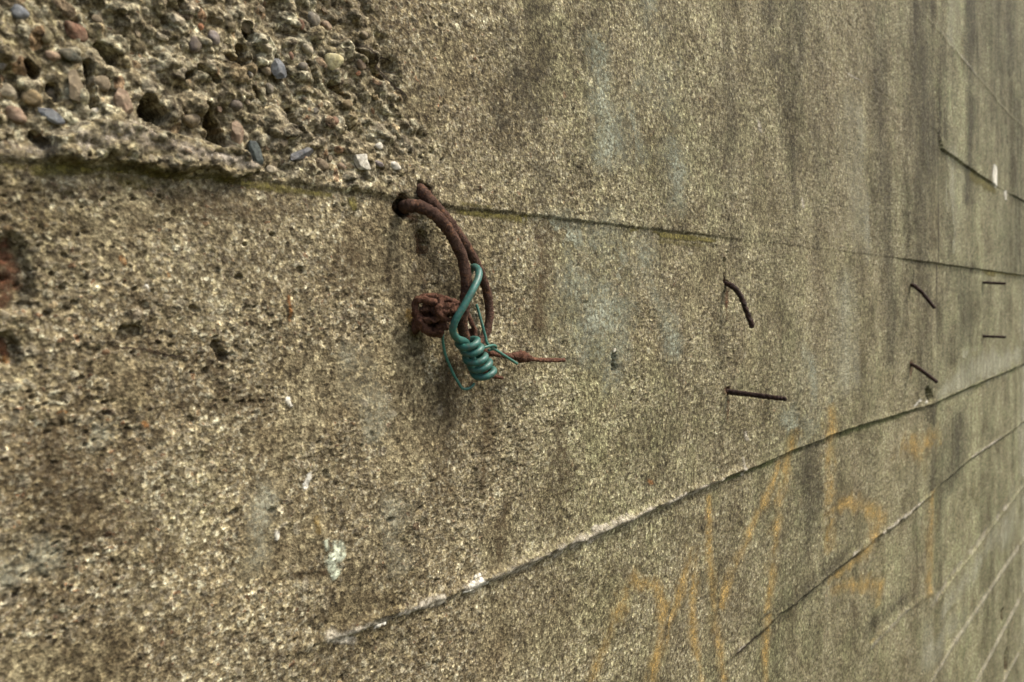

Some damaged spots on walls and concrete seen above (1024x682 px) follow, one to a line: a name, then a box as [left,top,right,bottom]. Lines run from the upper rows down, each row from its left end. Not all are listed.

spalling [0,0,424,188]